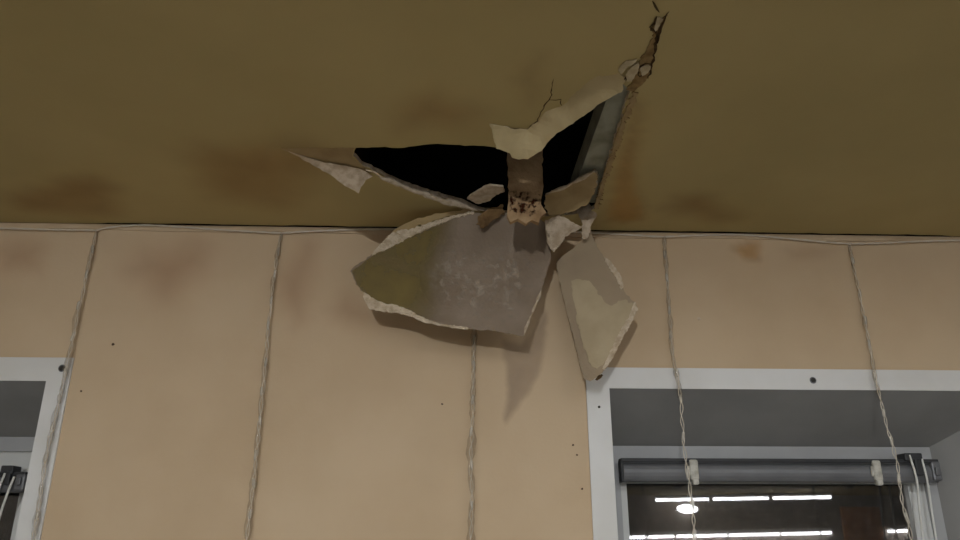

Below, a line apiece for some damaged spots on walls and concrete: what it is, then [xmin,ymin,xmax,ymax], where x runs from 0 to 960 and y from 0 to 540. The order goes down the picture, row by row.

crack [618,1,669,92]
crack [528,79,561,129]
peeling [489,73,626,159]
peeling [571,279,633,369]